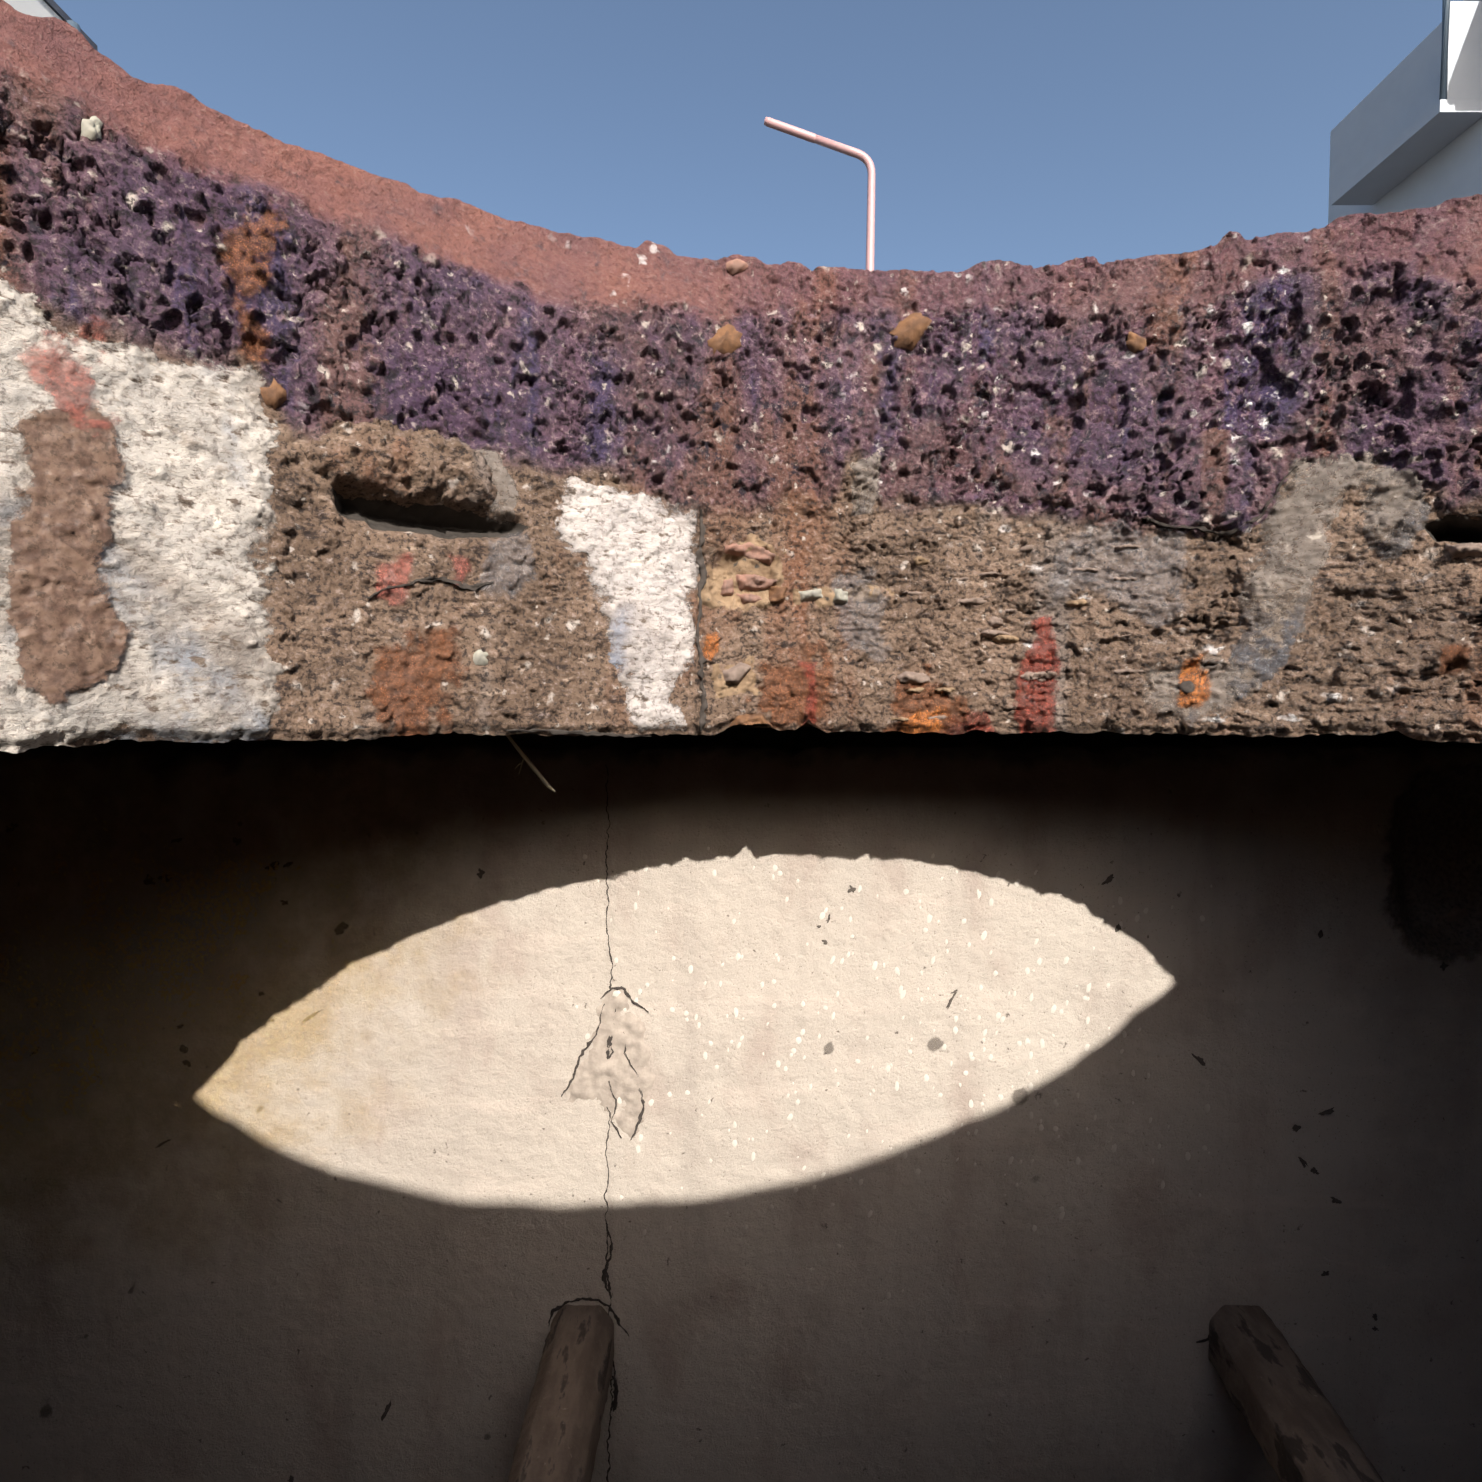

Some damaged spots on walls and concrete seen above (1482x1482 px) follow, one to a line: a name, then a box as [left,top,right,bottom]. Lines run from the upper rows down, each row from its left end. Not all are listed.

spalling [332,449,529,539]
crack [548,1106,629,1482]